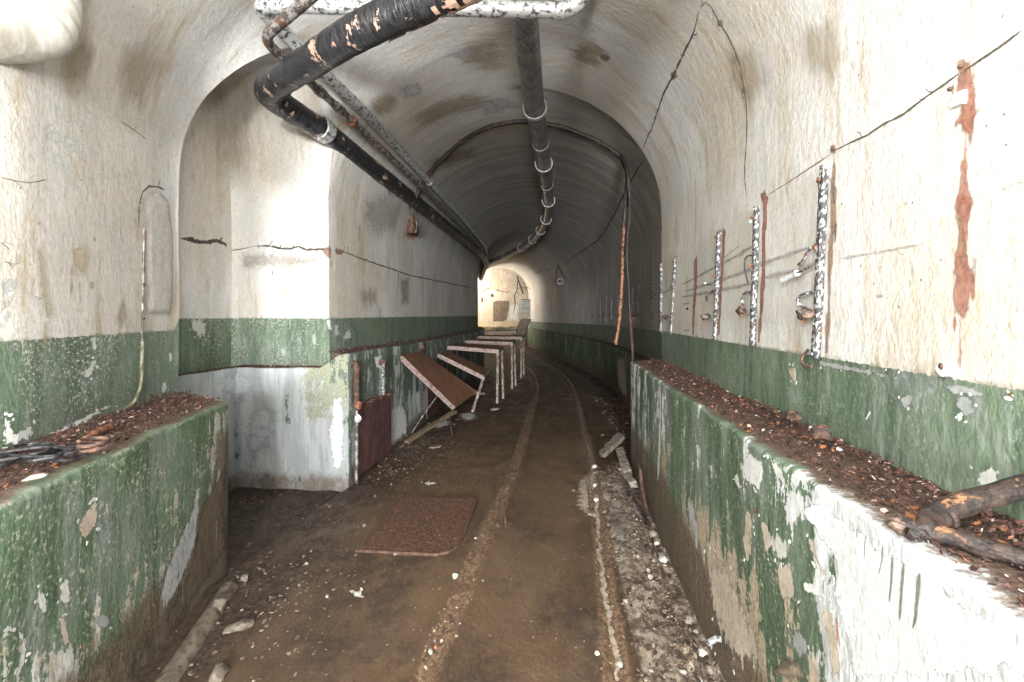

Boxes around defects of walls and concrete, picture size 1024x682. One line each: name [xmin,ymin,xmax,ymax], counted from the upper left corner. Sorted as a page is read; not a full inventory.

crack [181,1,1022,313]
corrosion [947,59,977,369]
corrosion [758,191,768,343]
corrosion [825,145,837,353]
peeling [3,412,36,448]
peeling [51,406,117,434]
peeling [733,450,787,493]
peeling [77,497,101,545]
peeling [34,578,70,645]
peeling [704,546,765,675]
peeling [3,626,31,682]
spalling [679,630,703,682]